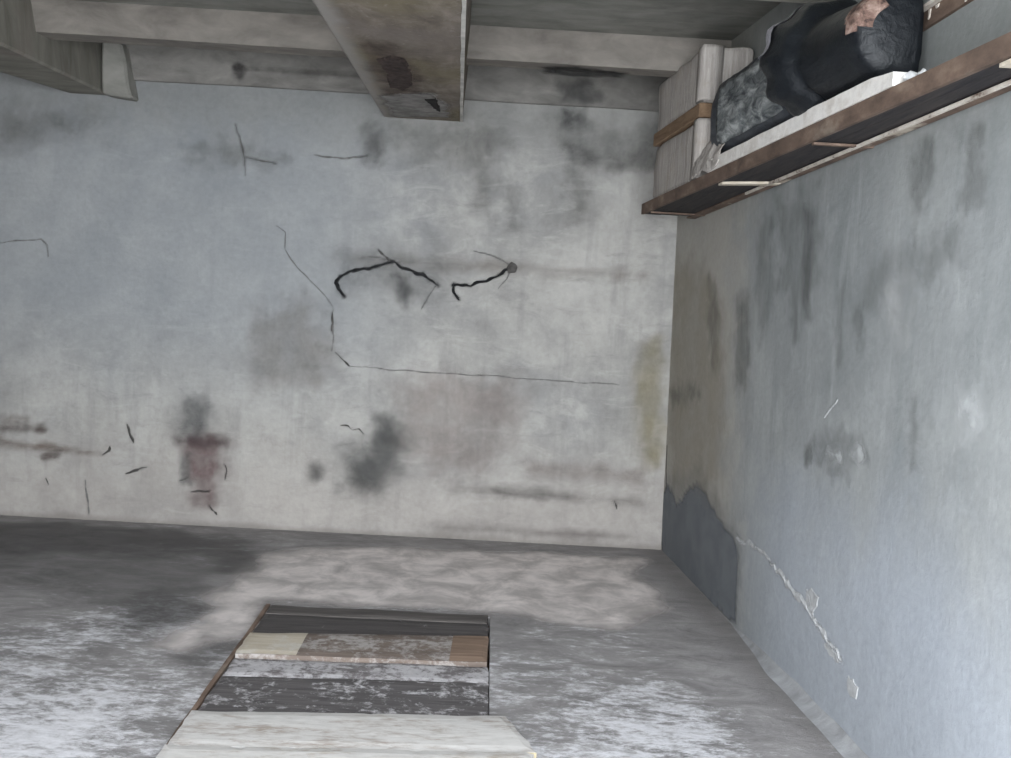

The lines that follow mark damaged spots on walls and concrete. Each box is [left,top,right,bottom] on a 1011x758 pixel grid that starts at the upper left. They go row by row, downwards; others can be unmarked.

spalling [374,0,466,122]
crack [235,124,276,175]
crack [0,238,48,252]
crack [276,225,617,385]
crack [736,537,859,699]